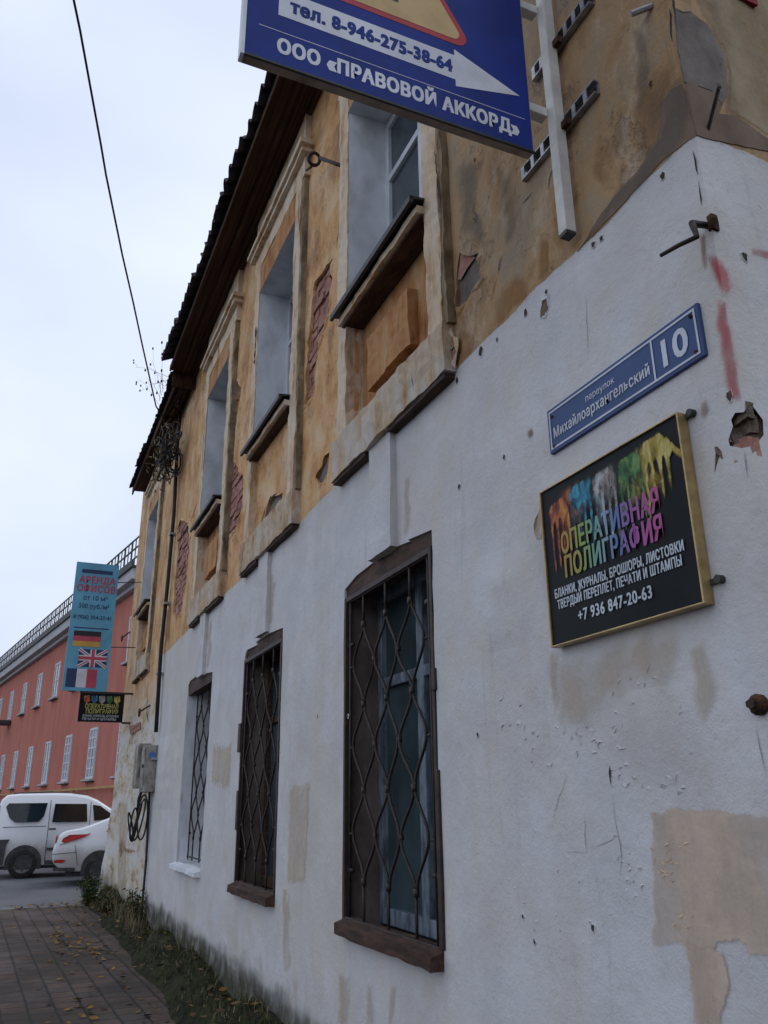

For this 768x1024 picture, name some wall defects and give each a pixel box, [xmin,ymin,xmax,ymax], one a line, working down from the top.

peeling [577,0,768,252]
spalling [304,258,333,410]
spalling [454,247,485,317]
spalling [226,379,245,578]
spalling [714,390,764,473]
spalling [173,518,191,619]
crack [573,766,622,876]